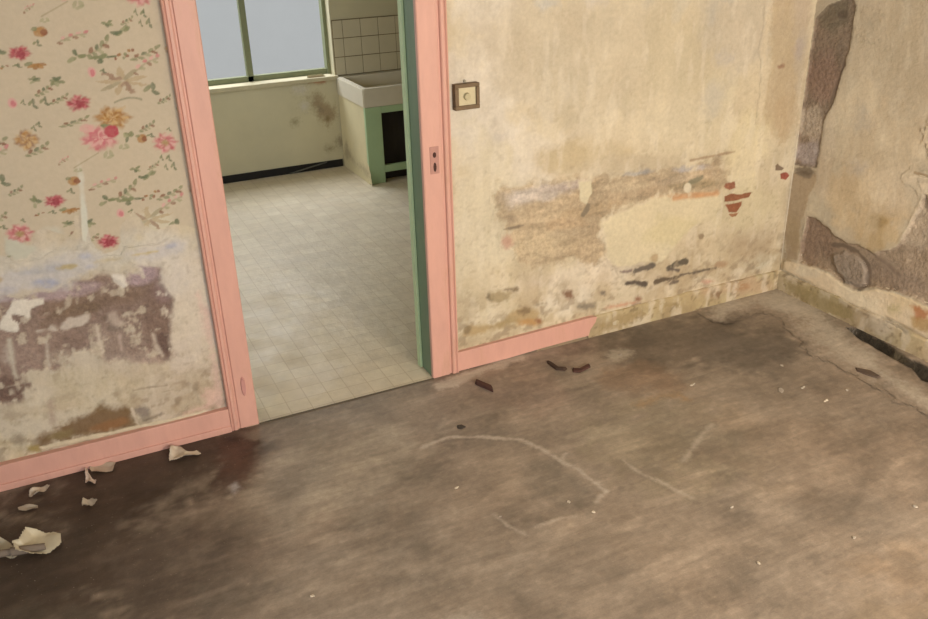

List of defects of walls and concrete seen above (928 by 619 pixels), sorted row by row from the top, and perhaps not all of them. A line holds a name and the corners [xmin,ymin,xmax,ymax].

spalling [828,57,847,106]
flaking render [0,264,182,410]
flaking render [489,150,752,272]
spalling [616,256,716,290]
peeling [774,43,811,263]
flaking render [798,166,928,306]